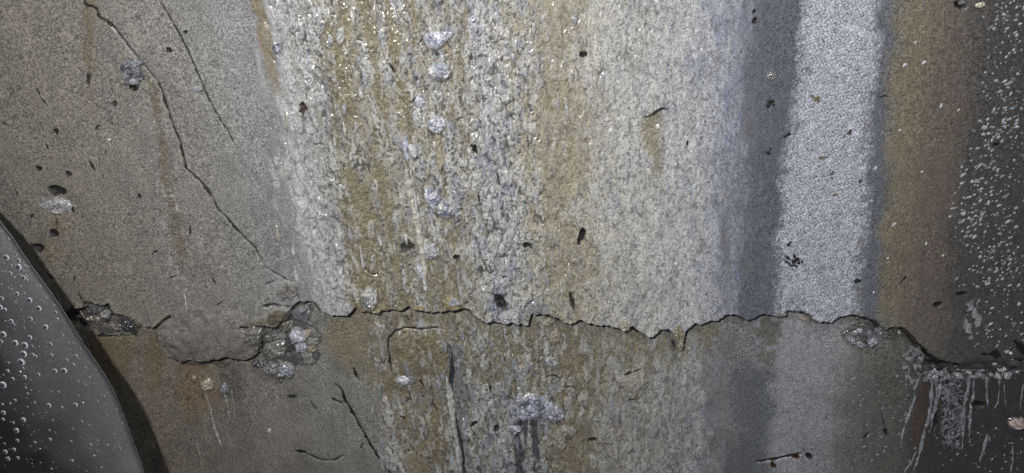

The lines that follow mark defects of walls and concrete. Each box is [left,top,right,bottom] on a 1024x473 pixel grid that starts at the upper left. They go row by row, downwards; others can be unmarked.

crack [83,0,320,367]
water stain [248,0,1024,473]
crack [47,273,128,337]
spalling [74,304,141,337]
spalling [241,302,325,383]
crack [309,368,391,473]
crack [355,304,466,473]
crack [667,323,696,350]
crack [852,315,950,364]
crack [975,340,1024,359]